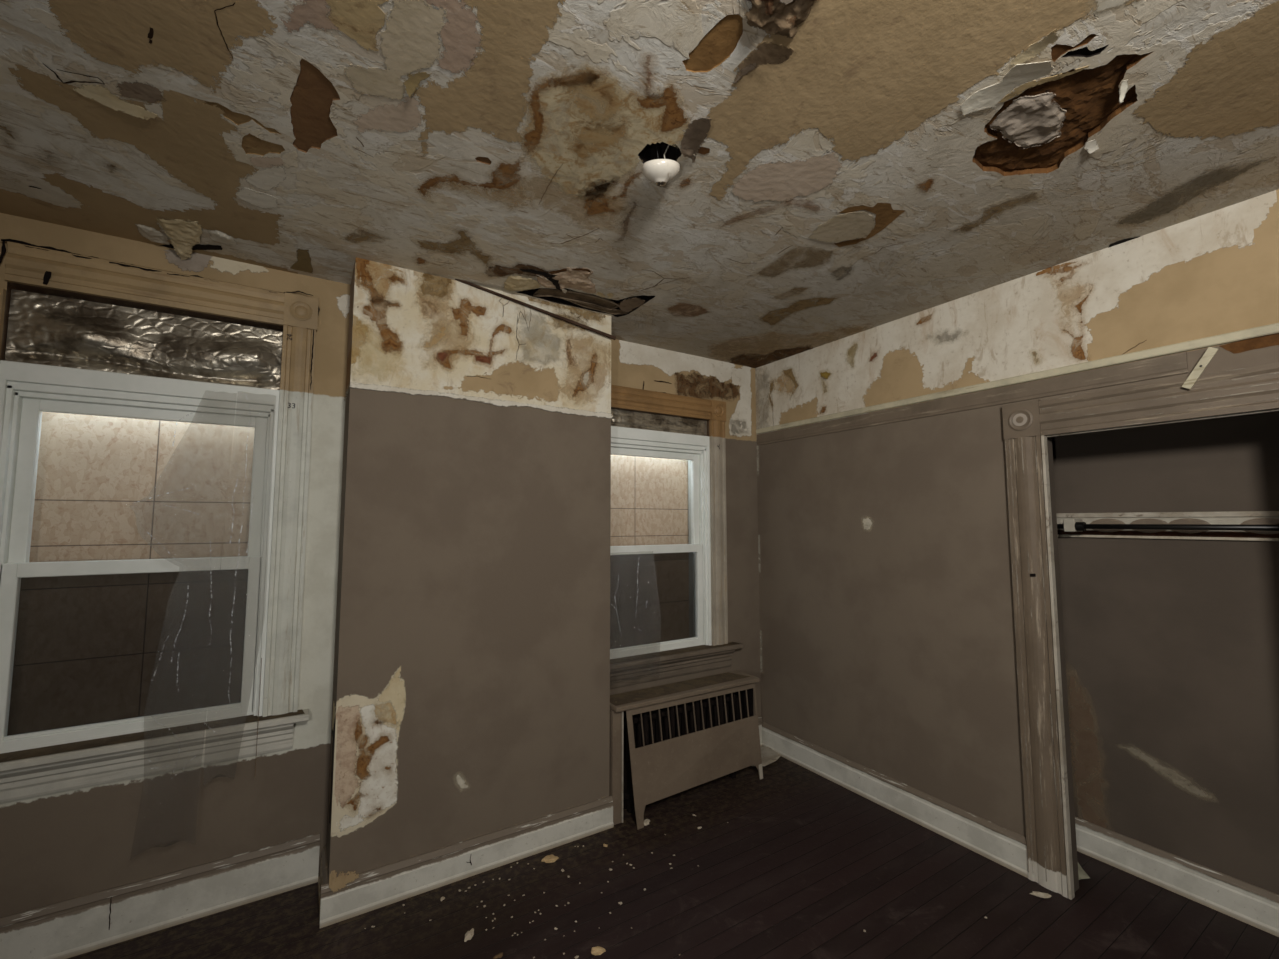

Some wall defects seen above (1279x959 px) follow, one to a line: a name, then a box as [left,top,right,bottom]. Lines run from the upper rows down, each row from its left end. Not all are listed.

peeling [0,0,565,276]
damp [417,55,689,216]
peeling [680,0,1279,247]
peeling [336,294,369,364]
flaking render [755,190,1277,440]
flaking render [329,701,399,834]